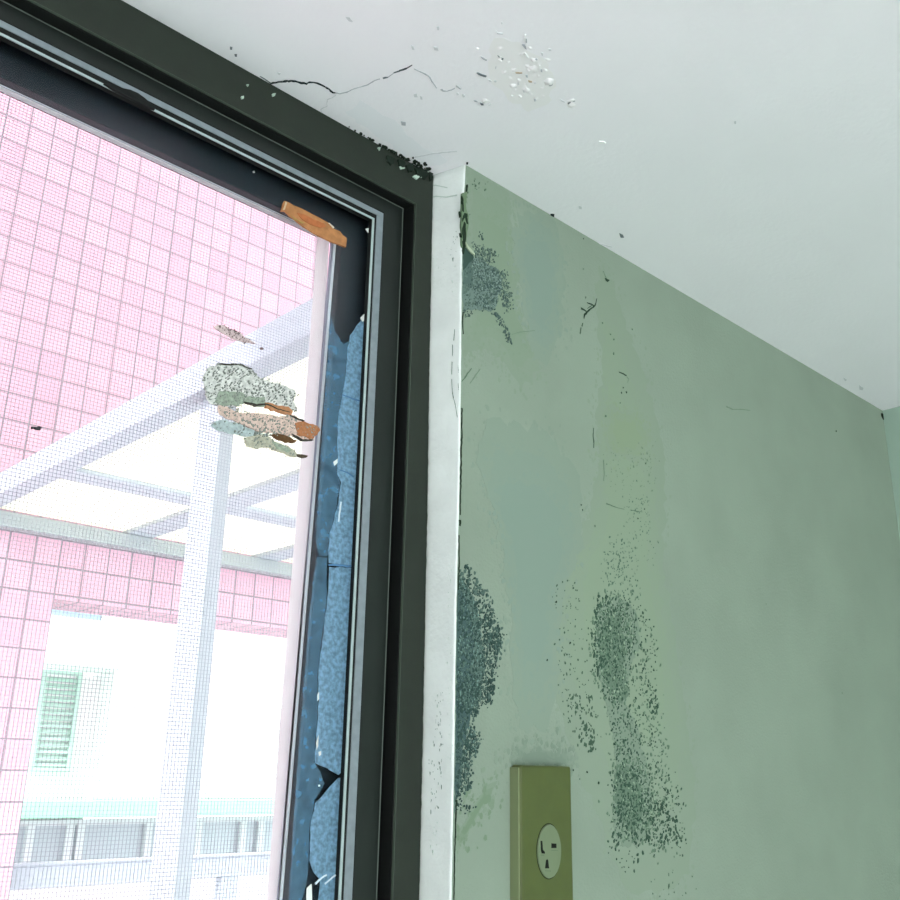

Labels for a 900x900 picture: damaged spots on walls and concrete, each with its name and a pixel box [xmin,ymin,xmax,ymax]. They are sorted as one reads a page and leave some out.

crack [260,65,455,112]
flaking render [349,126,431,171]
damp [438,167,573,401]
damp [429,257,699,900]